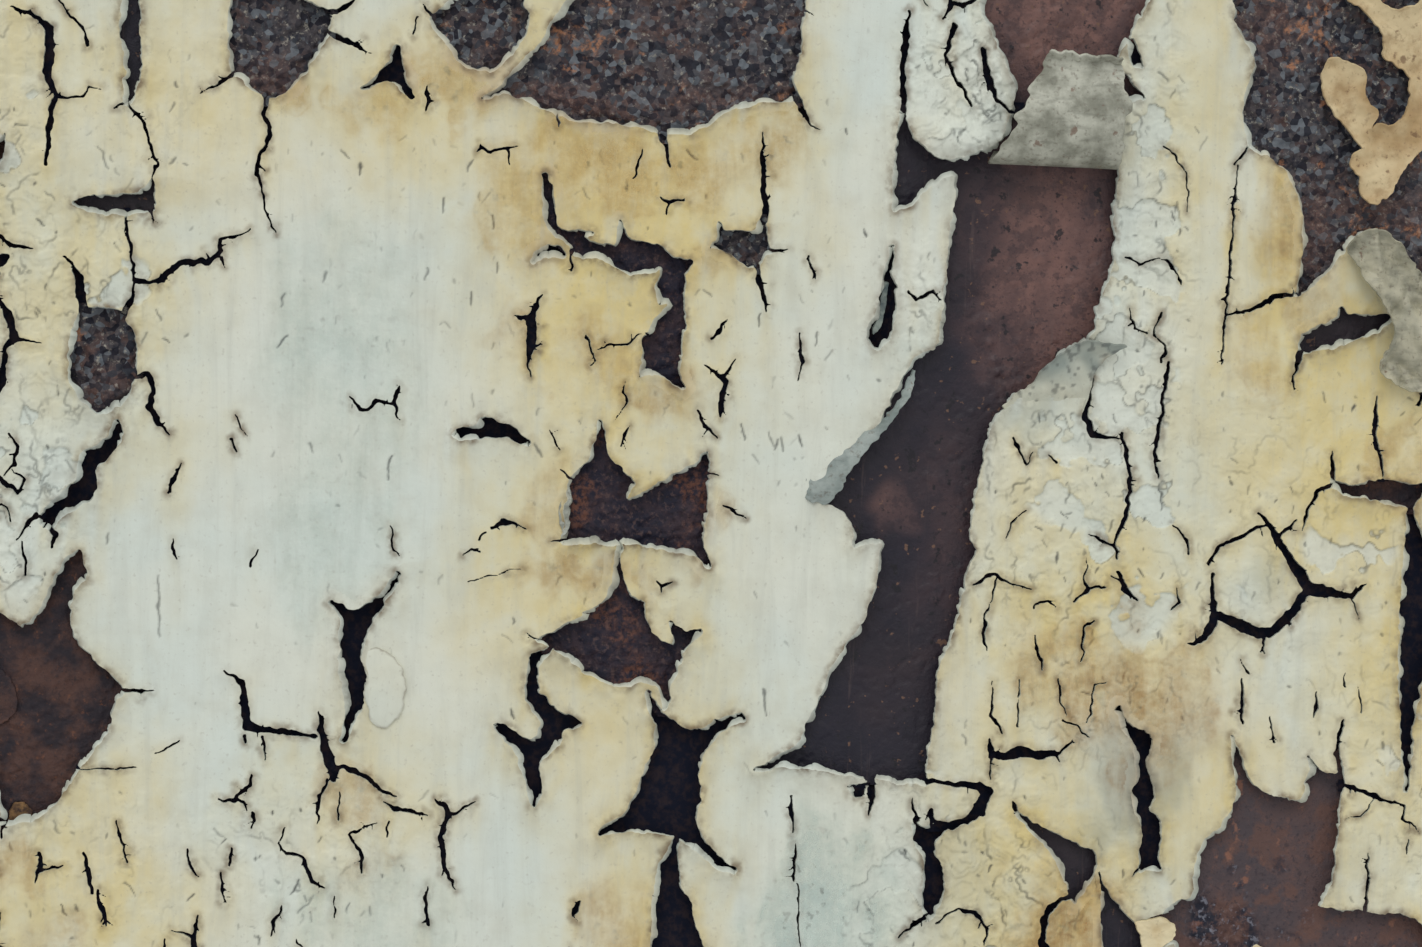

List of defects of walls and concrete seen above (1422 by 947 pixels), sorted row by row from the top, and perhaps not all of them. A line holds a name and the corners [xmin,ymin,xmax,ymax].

crack [0,254,40,392]
crack [10,0,101,166]
crack [122,208,251,288]
peeling [423,0,819,168]
peeling [1224,0,1422,406]
peeling [0,256,170,839]
crack [163,670,476,947]
peeling [483,410,755,947]
peeling [744,0,1157,938]
crack [916,309,1170,832]
peeling [1006,695,1422,947]
crack [1171,512,1365,743]